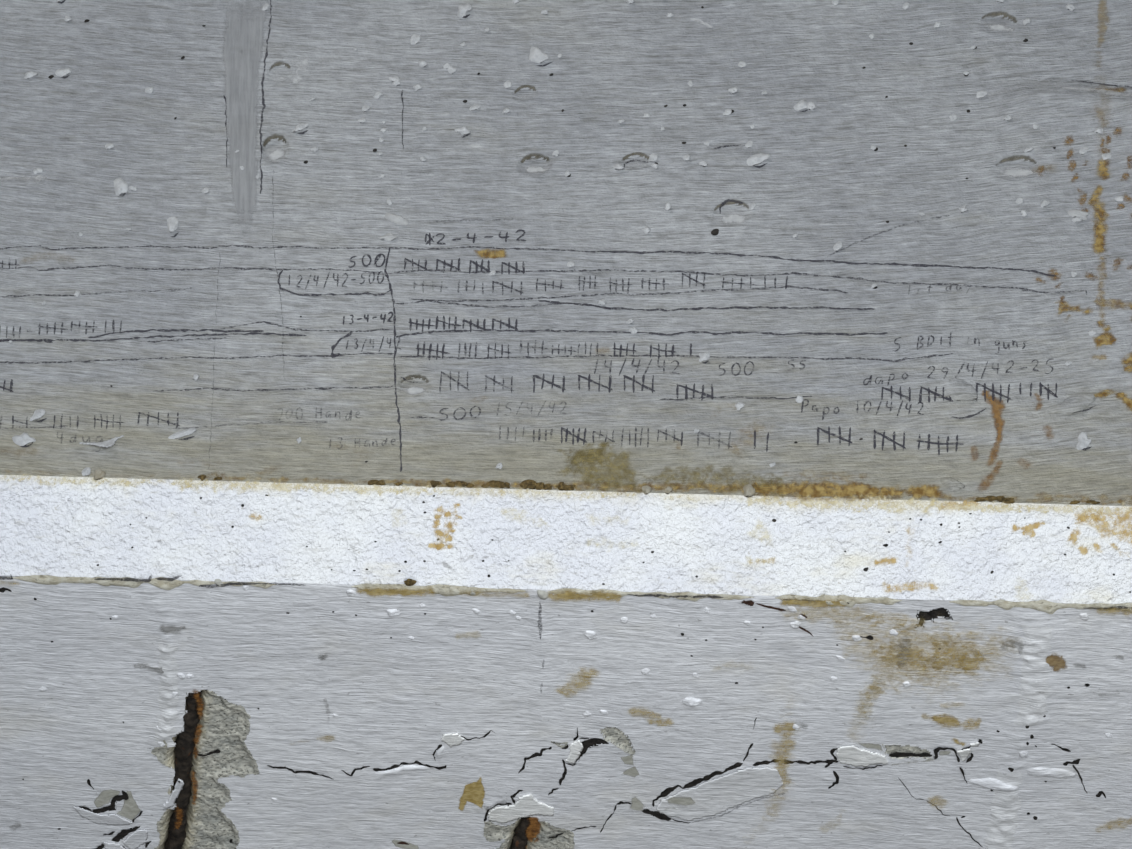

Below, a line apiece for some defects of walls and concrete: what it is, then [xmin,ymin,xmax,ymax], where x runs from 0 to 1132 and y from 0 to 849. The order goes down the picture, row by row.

rust [1036,128,1132,359]
rust [1094,390,1132,411]
spalling [74,690,259,849]
crack [267,730,495,779]
crack [482,727,609,822]
crack [572,718,839,833]
crack [1025,726,1106,798]
spalling [483,793,575,849]
crack [899,779,988,849]